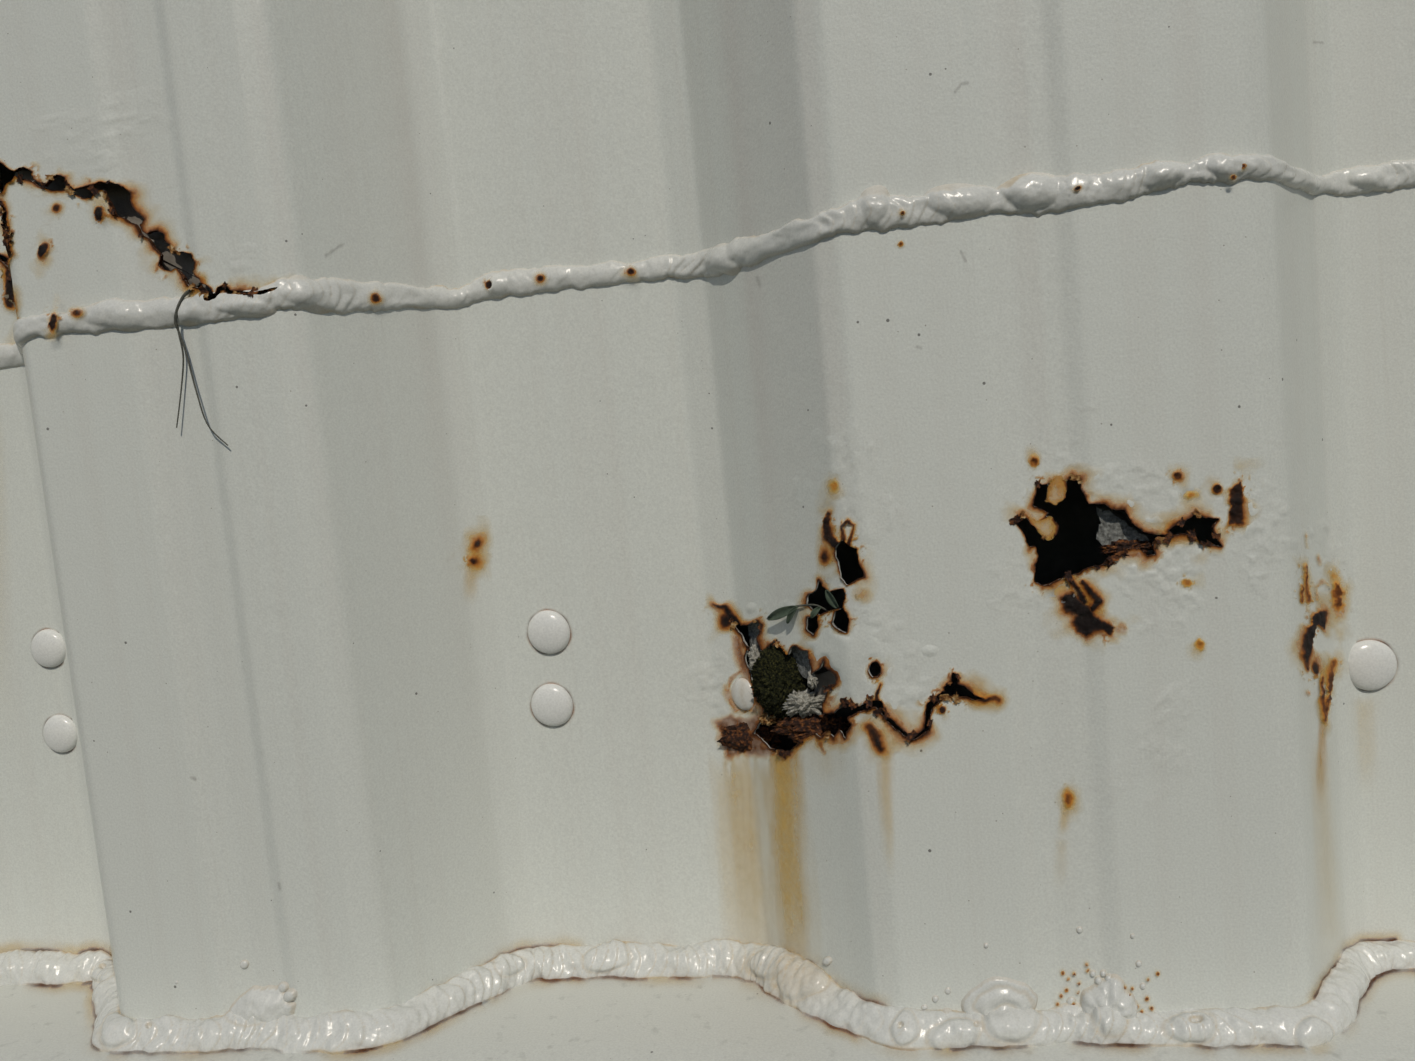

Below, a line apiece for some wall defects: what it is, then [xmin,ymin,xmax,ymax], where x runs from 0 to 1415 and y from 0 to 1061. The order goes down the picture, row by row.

corrosion [40,175,117,223]
corrosion [0,201,18,319]
corrosion [37,241,54,261]
corrosion [180,275,277,301]
corrosion [47,308,83,334]
corrosion [1009,510,1026,526]
corrosion [1156,469,1249,548]
corrosion [464,532,487,570]
corrosion [1044,548,1129,642]
corrosion [1297,557,1347,725]
corrosion [1062,788,1076,809]
corrosion [774,730,831,922]